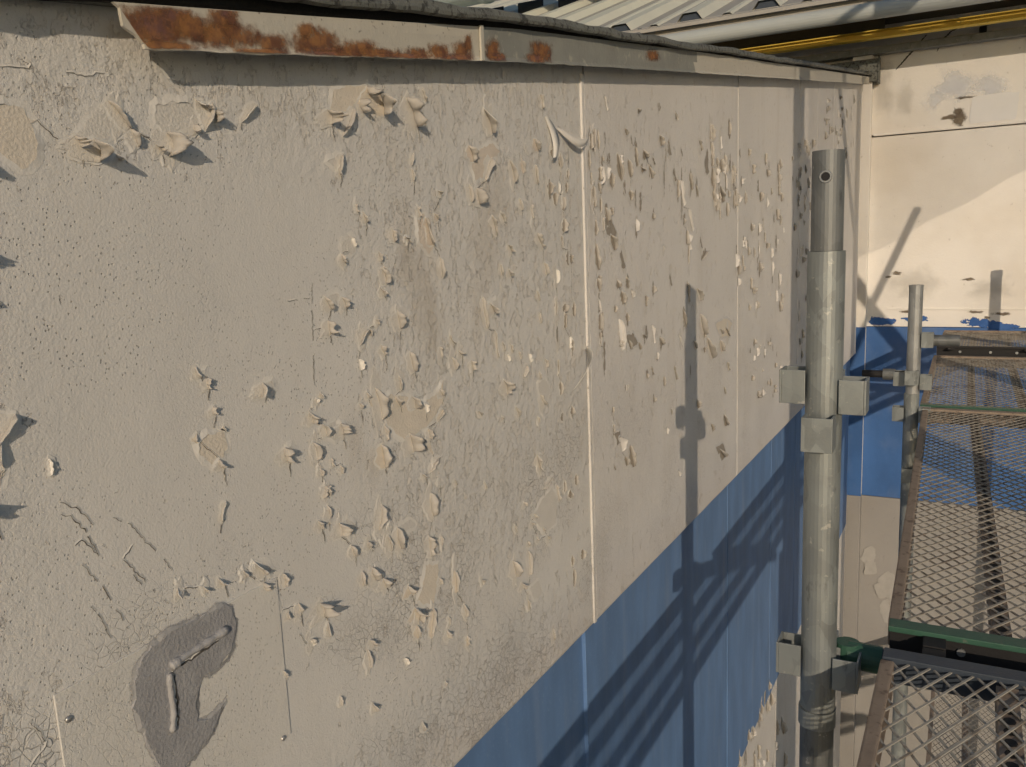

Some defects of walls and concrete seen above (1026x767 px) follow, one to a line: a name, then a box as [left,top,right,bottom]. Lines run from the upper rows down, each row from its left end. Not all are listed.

corrosion [123,6,472,60]
corrosion [486,41,506,61]
corrosion [527,42,551,63]
peeling [54,92,225,172]
peeling [465,93,856,405]
peeling [869,316,908,325]
peeling [960,317,1020,330]
peeling [273,79,478,667]
peeling [0,407,21,492]
crack [60,490,173,638]
crack [0,714,48,767]
peeling [739,680,788,767]